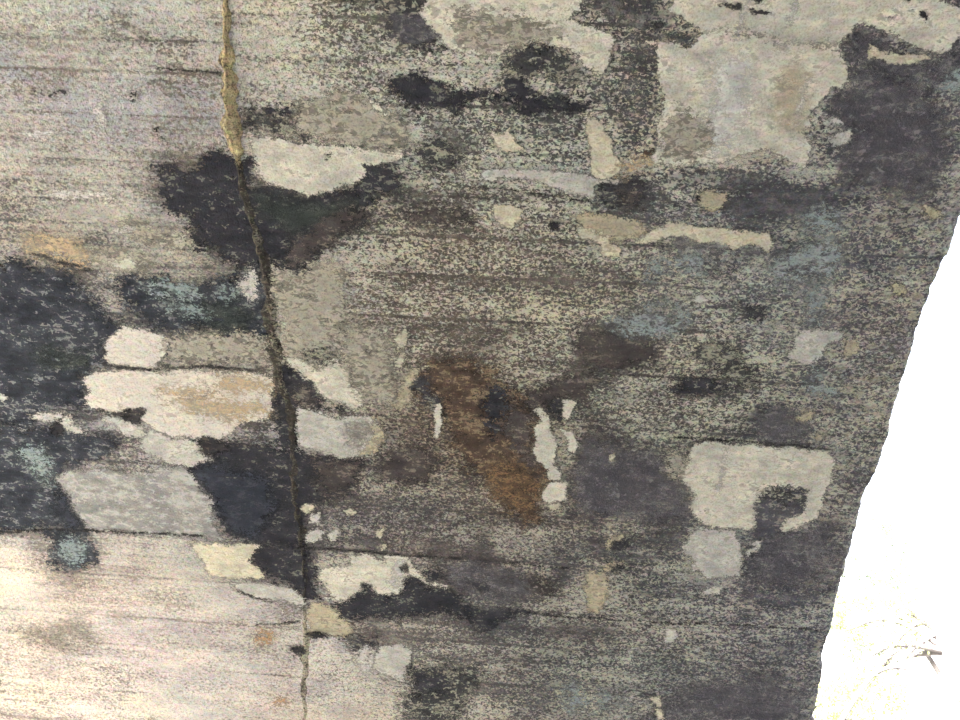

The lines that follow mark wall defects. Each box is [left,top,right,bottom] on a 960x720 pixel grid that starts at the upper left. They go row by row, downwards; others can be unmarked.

crack [156,67,221,75]
peeling [250,85,413,198]
peeling [418,0,618,80]
peeling [481,0,960,230]
damp [253,189,374,270]
damp [31,340,94,371]
crack [101,362,256,372]
peeling [55,254,448,657]
corrosion [372,326,665,535]
damp [47,483,92,571]
peeling [661,433,836,596]
crack [233,588,347,637]